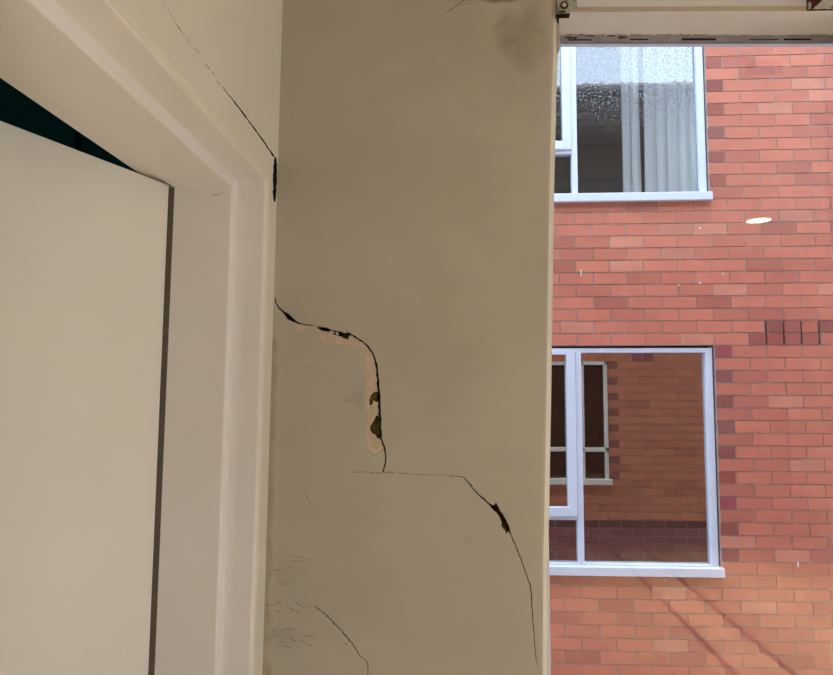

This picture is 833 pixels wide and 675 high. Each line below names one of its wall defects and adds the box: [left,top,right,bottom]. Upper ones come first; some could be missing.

crack [162,0,277,202]
crack [275,297,538,666]
crack [265,556,368,675]